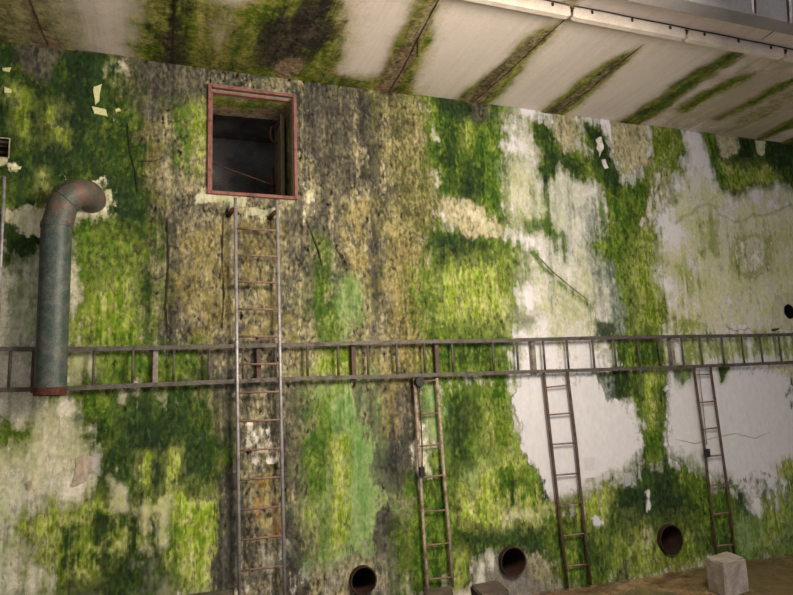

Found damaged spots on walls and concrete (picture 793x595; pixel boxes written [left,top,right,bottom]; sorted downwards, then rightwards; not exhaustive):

water stain [677,73,755,112]
water stain [713,79,793,130]
peeling [640,167,670,227]
water stain [210,462,248,591]
water stain [245,422,278,465]
water stain [278,508,311,595]
water stain [331,434,351,552]
water stain [369,427,417,497]
water stain [364,503,426,595]
peeling [512,366,644,503]
peeling [663,360,793,505]